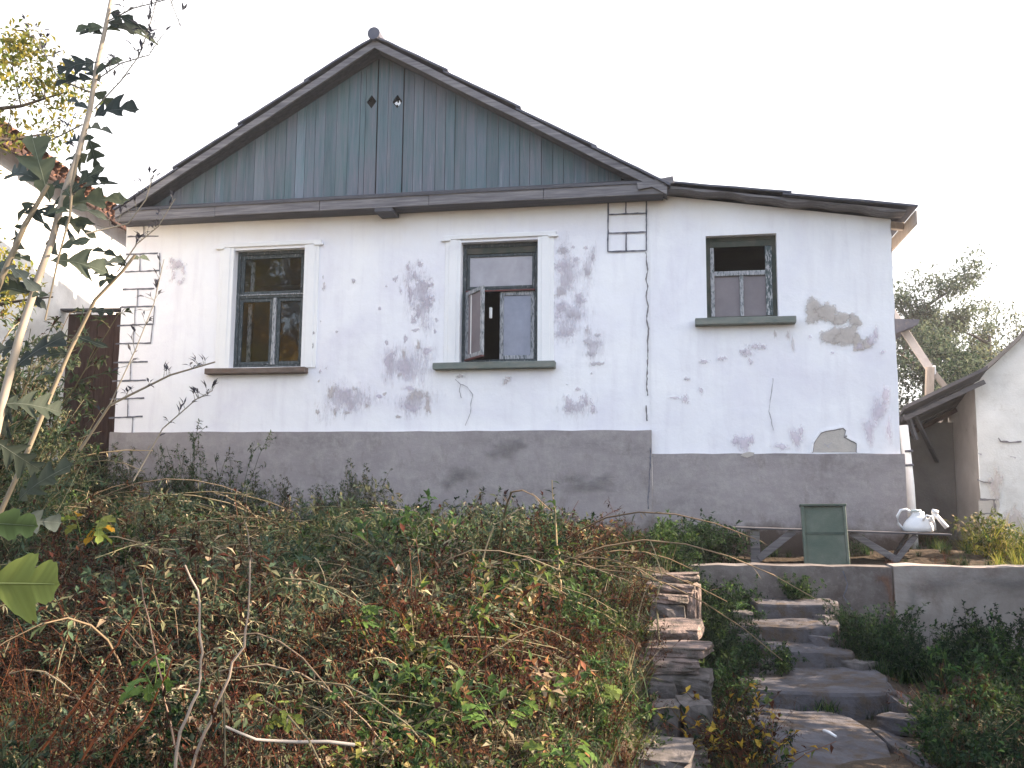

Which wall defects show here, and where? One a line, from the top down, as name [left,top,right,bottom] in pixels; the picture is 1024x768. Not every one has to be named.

peeling [386,262,437,342]
peeling [555,246,595,336]
crack [643,252,651,421]
crack [455,379,473,426]
crack [645,448,653,509]
spalling [811,426,859,453]